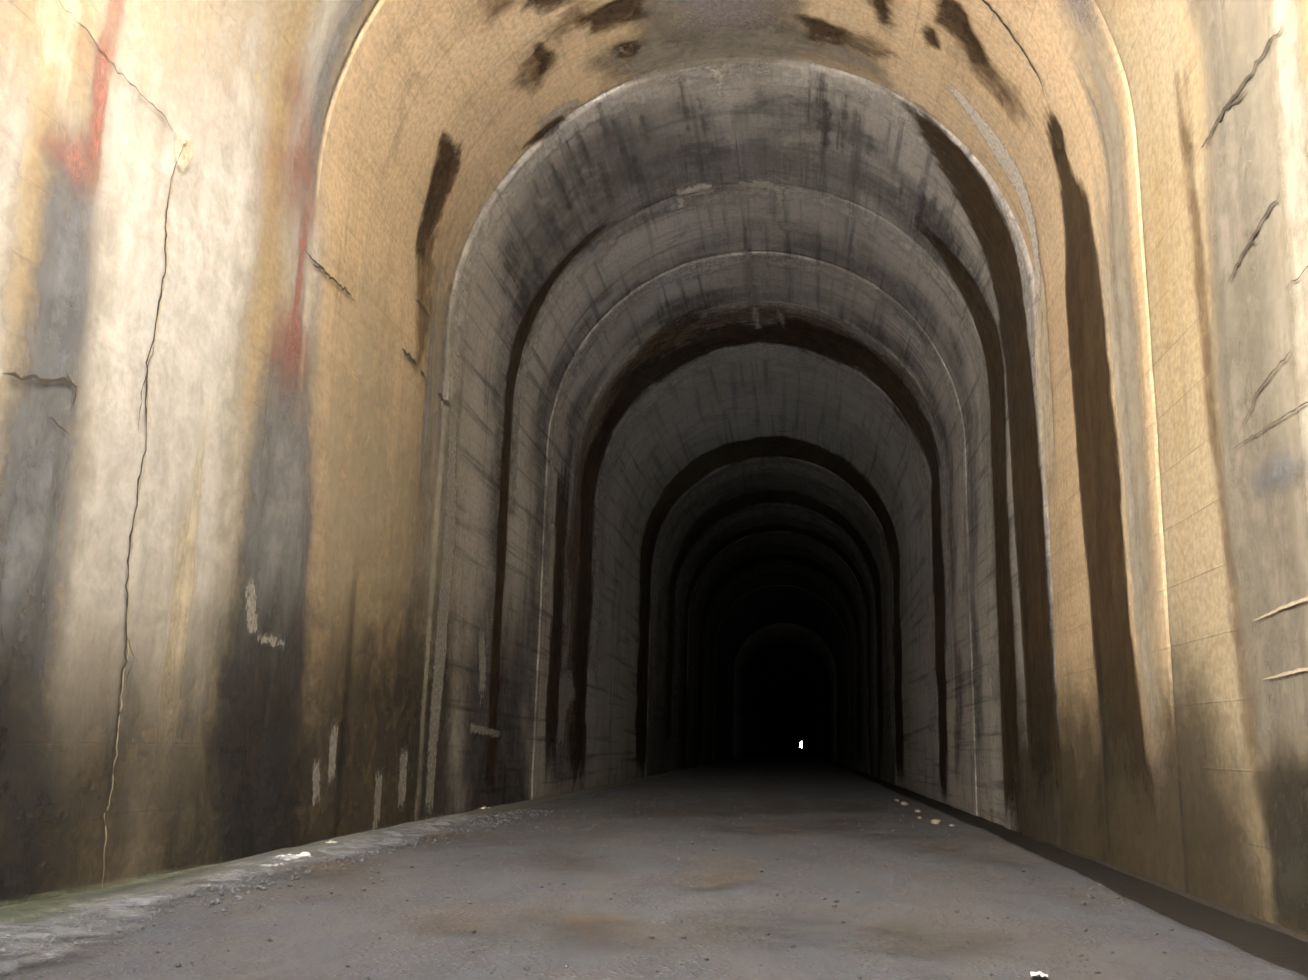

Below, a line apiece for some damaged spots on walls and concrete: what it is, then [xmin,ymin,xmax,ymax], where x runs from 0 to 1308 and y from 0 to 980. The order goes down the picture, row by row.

corrosion [64,41,113,179]
crack [1198,26,1282,155]
crack [59,0,184,889]
damp [0,0,903,908]
damp [544,249,968,796]
damp [666,0,1308,942]
crack [1227,352,1308,453]